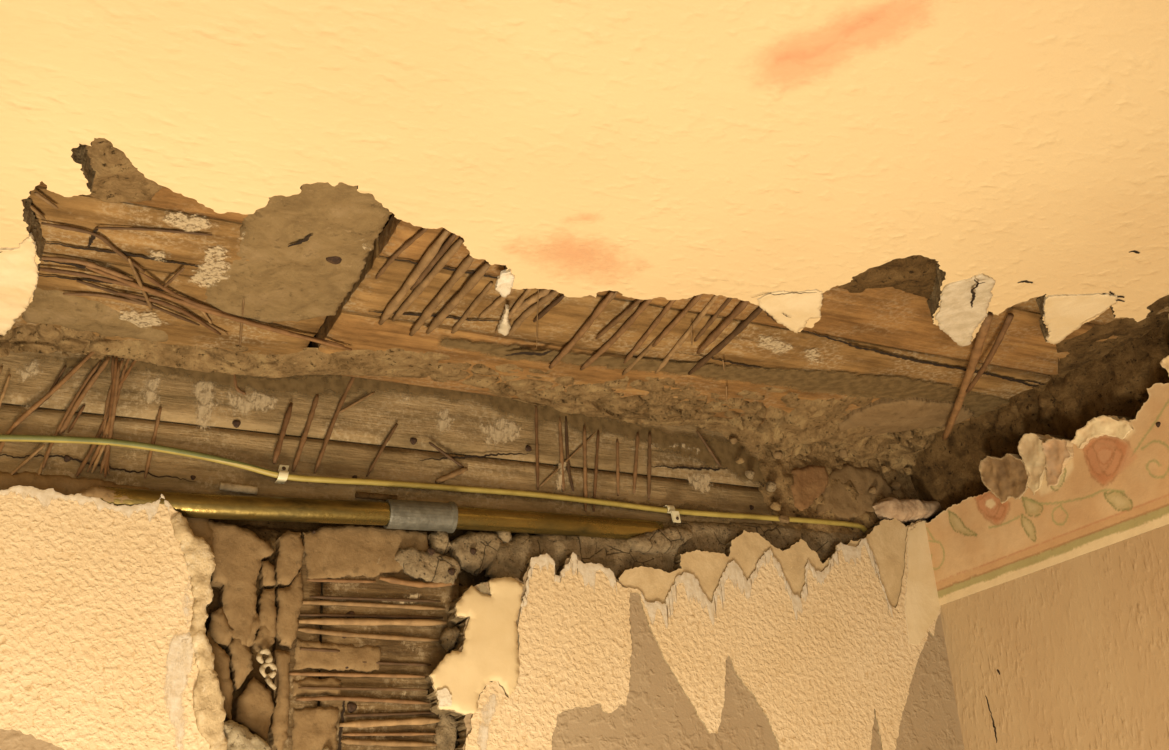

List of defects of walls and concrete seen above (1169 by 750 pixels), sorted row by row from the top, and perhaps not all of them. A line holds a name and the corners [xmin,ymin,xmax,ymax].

peeling [0,232,39,336]
peeling [495,268,515,297]
peeling [757,289,823,333]
peeling [935,273,996,347]
crack [970,279,985,307]
peeling [1043,293,1118,345]
peeling [979,415,1134,504]
peeling [0,485,228,750]
peeling [429,518,941,750]